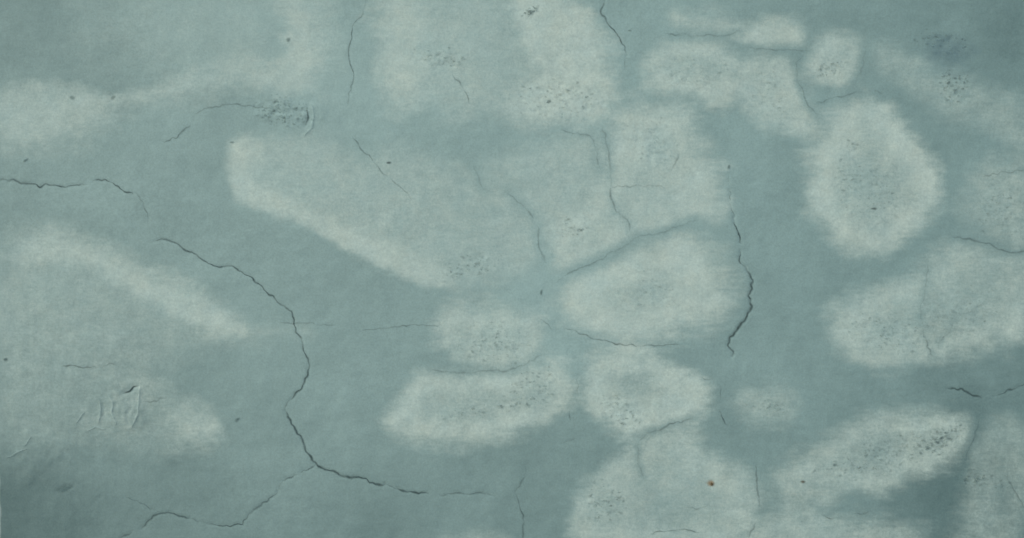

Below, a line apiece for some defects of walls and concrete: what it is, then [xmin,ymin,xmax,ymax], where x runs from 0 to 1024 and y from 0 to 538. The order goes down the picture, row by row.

damp [219,0,1024,538]
crack [728,224,752,344]
crack [287,314,423,494]